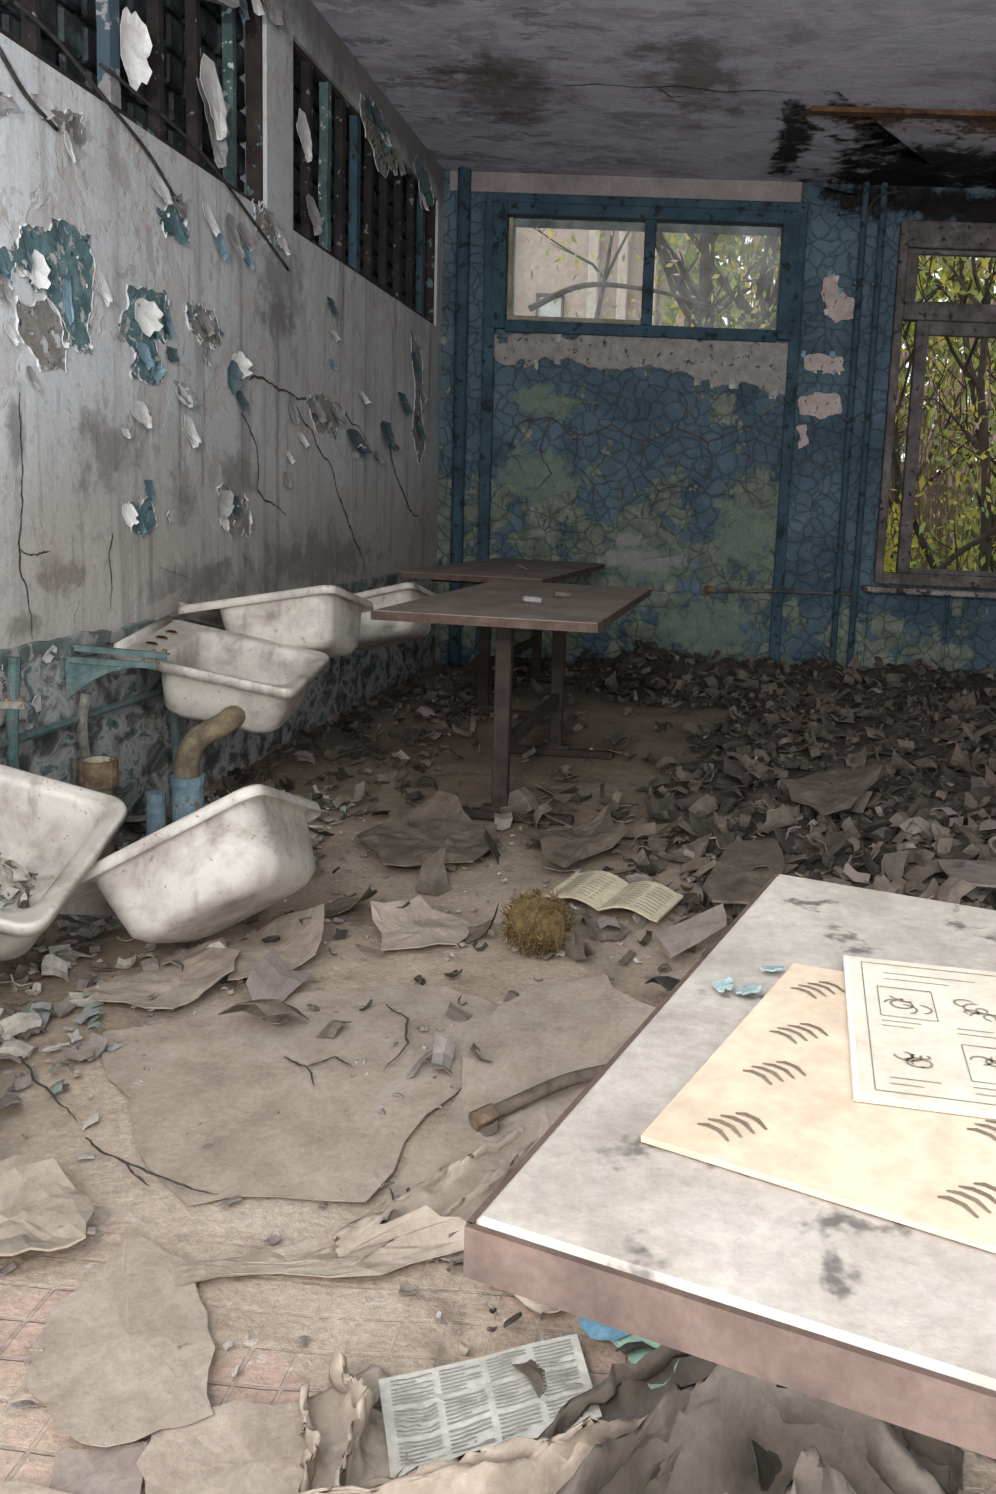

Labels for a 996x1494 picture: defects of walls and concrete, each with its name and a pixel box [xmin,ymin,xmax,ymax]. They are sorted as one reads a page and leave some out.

peeling [120,7,152,94]
peeling [205,0,284,27]
peeling [196,53,230,168]
peeling [296,108,312,162]
damp [769,100,816,176]
peeling [306,194,322,235]
peeling [0,218,253,448]
peeling [283,332,430,489]
peeling [489,325,845,449]
peeling [122,480,173,538]
peeling [216,483,253,540]
peeling [595,531,687,587]